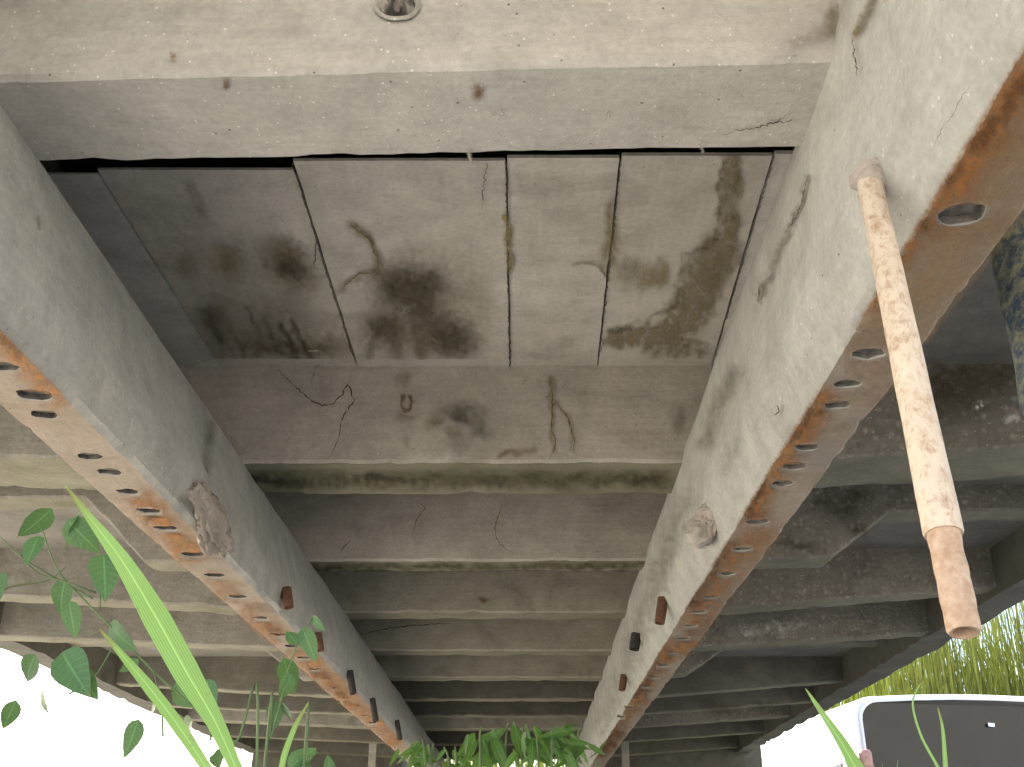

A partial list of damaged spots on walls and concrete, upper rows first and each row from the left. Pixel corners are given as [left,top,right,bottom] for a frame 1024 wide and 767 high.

crack [723,111,794,135]
corrosion [900,54,1024,265]
crack [481,161,514,369]
crack [599,158,622,357]
damp [602,155,741,358]
corrosion [0,331,59,397]
damp [204,308,327,358]
damp [372,272,471,351]
crack [279,365,355,457]
crack [549,375,575,459]
corrosion [135,493,201,561]
corrosion [596,392,836,757]